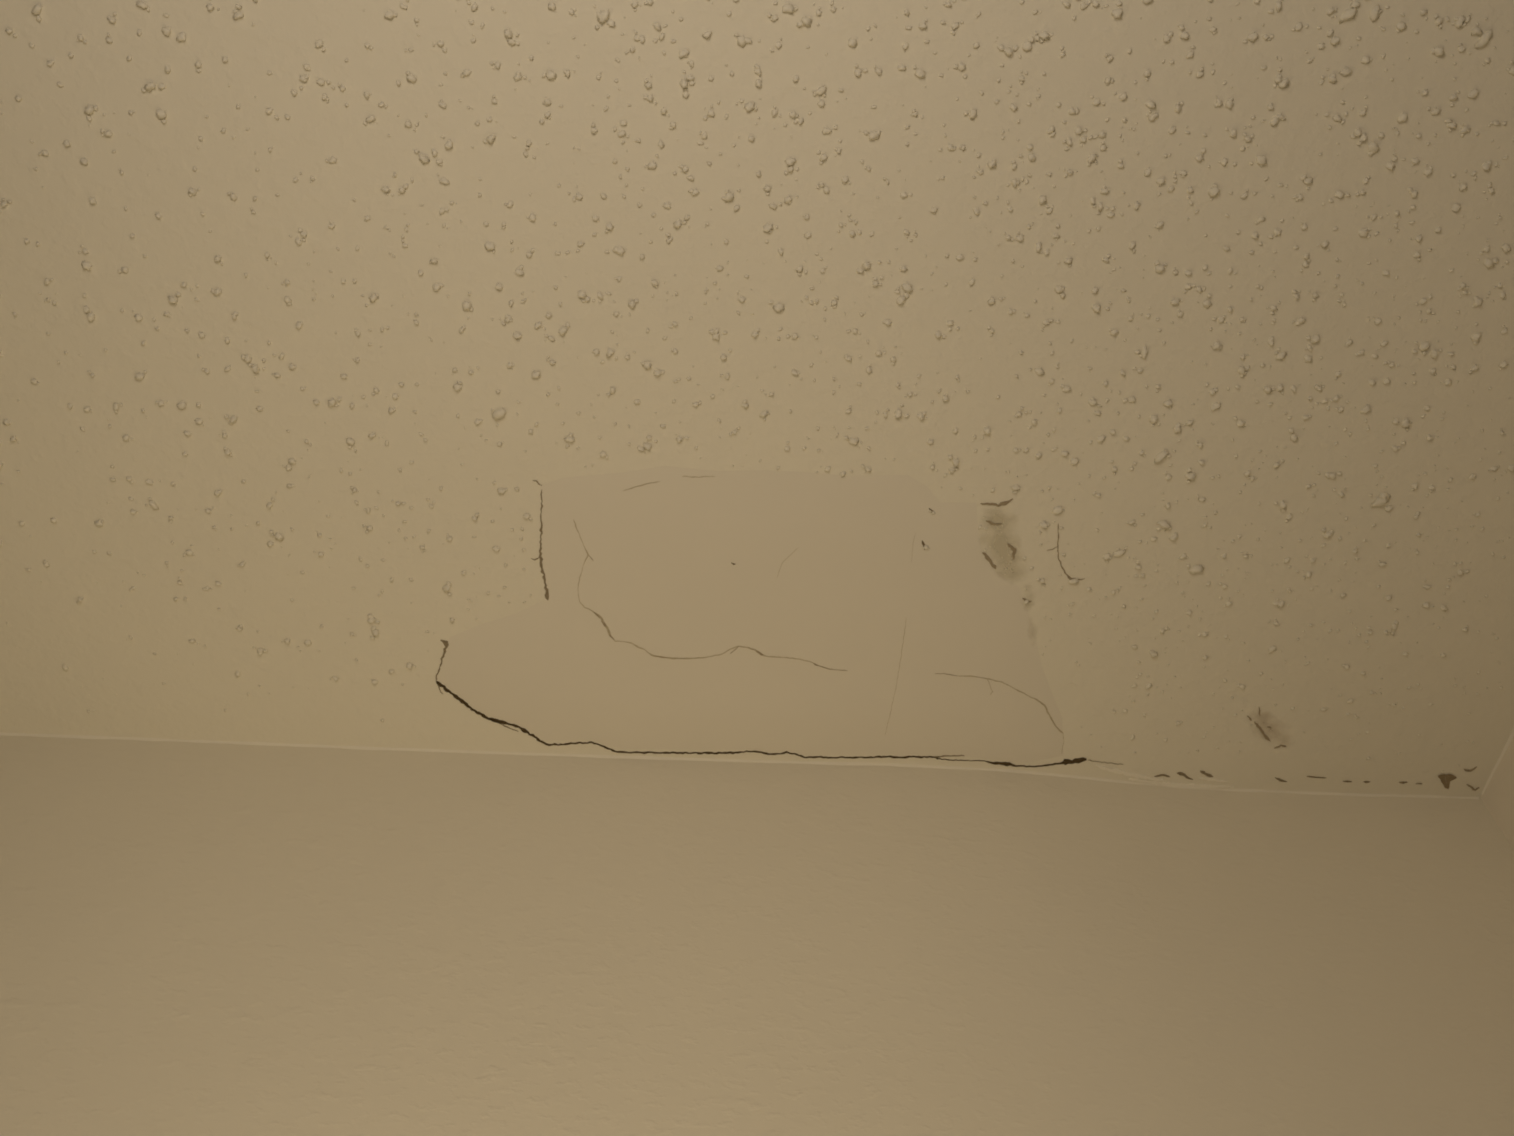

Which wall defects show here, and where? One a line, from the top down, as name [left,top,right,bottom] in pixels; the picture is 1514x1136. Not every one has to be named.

crack [531,480,846,671]
crack [1047,524,1085,580]
crack [436,640,1123,768]